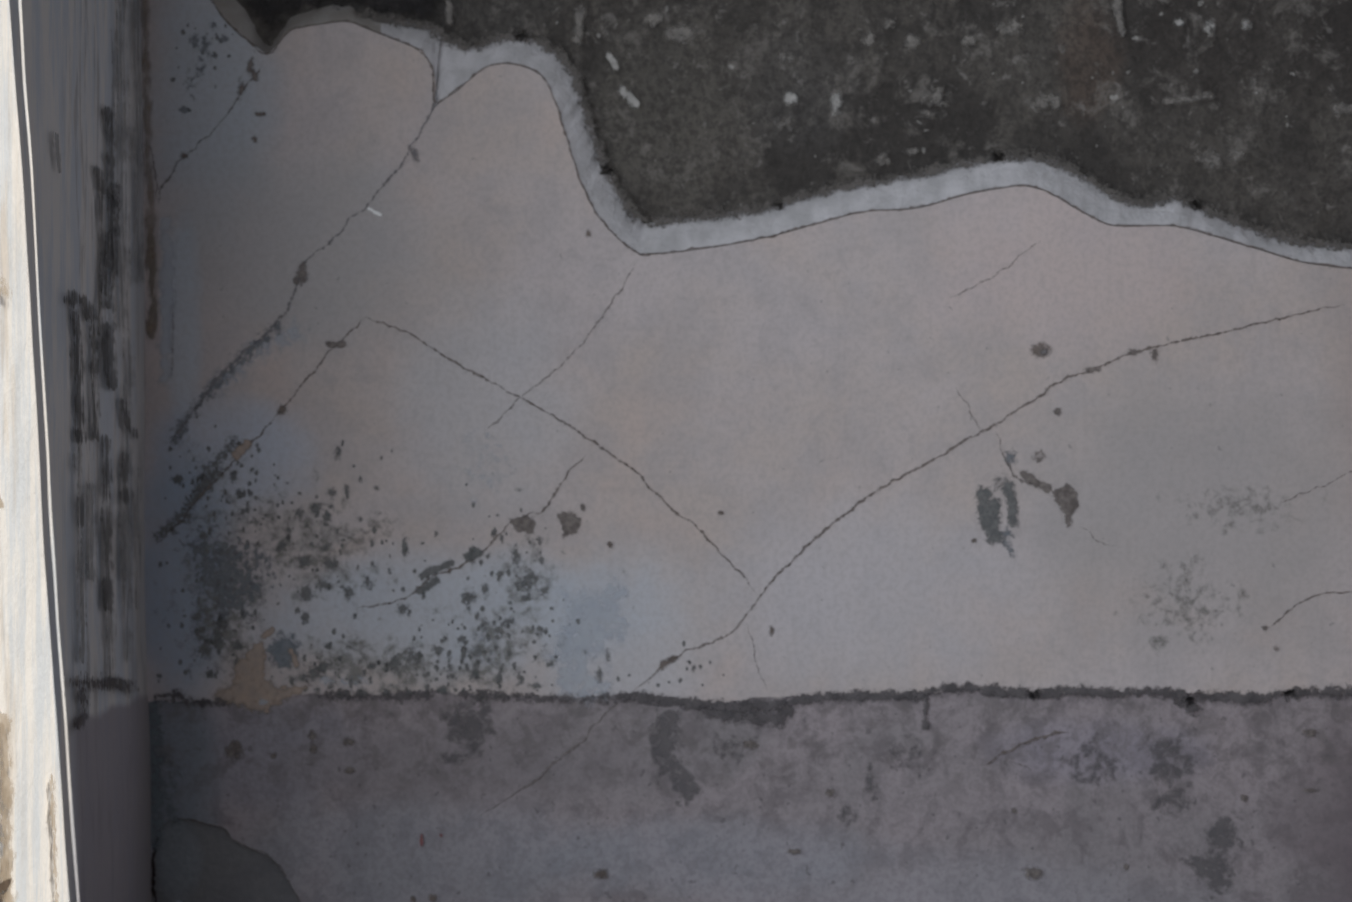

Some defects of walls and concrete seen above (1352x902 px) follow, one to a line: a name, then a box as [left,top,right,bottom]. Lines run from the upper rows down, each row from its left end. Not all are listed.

leakage [171,22,231,88]
crack [158,57,260,203]
spalling [237,0,1352,244]
spalling [617,226,808,254]
spalling [827,184,1352,269]
leakage [64,0,144,689]
crack [153,86,1347,815]
leakage [972,452,1018,556]
leakage [166,442,580,763]
leakage [649,711,699,803]
spalling [151,818,300,902]